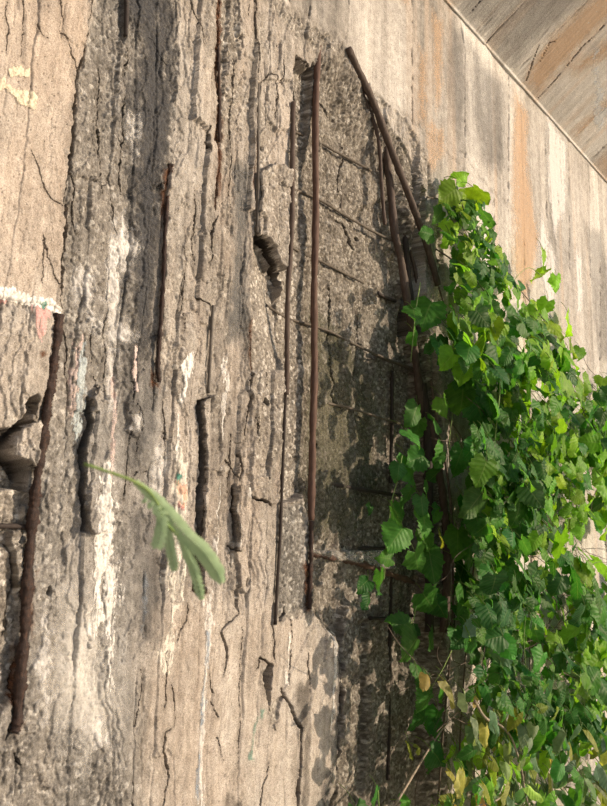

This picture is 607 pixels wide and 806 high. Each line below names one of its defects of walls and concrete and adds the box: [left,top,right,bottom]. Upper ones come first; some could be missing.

crack [5,0,129,402]
leakage [74,0,177,406]
rust [214,1,222,73]
rust [214,120,223,196]
spalling [215,0,246,174]
spalling [0,0,194,806]
efflorescence [152,446,166,493]
crack [224,332,284,513]
spalling [247,0,456,806]
spalling [228,551,251,612]
crack [162,604,189,806]
crack [209,606,311,806]